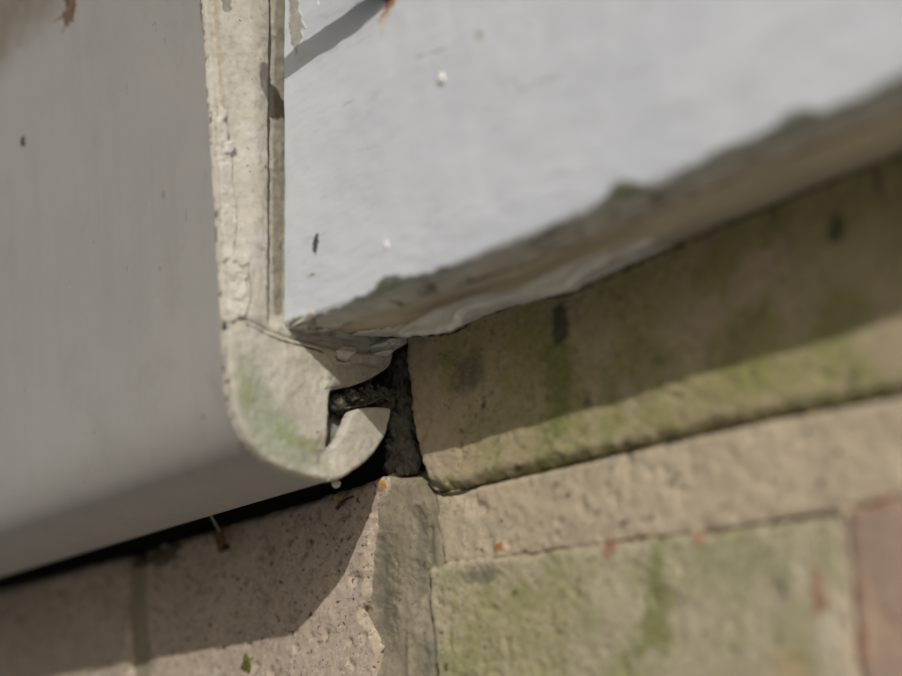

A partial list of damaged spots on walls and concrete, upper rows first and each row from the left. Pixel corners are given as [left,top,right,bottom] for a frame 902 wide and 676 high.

peeling [288,0,306,56]
corrosion [371,0,405,38]
peeling [323,239,670,477]
damp [487,310,548,449]
damp [777,520,823,609]
damp [810,585,859,676]